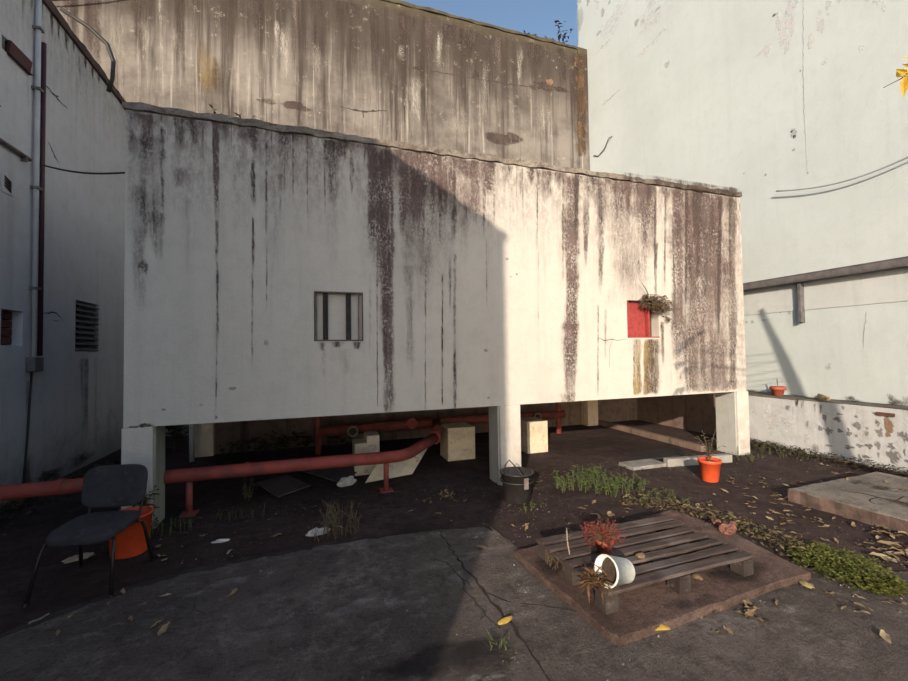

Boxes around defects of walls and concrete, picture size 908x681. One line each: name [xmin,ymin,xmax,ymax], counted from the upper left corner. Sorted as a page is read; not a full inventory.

damp [275,25,289,78]
damp [131,114,165,163]
damp [177,119,229,208]
damp [248,127,308,201]
damp [258,99,311,111]
damp [412,84,420,120]
damp [486,132,522,145]
damp [324,140,495,413]
damp [509,169,737,436]
corrosion [633,323,664,395]
peeling [818,413,908,464]
crack [436,530,577,681]